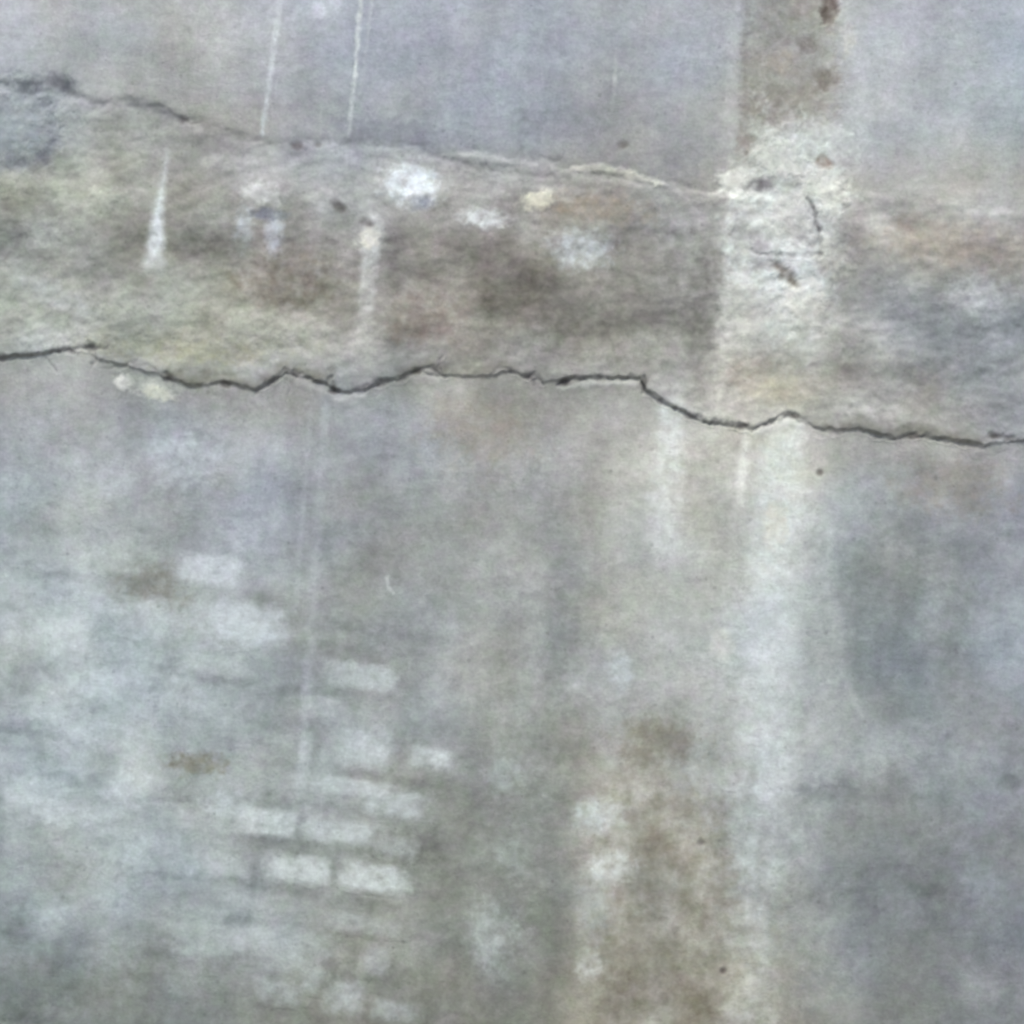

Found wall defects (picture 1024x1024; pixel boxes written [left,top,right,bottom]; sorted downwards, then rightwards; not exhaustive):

crack [14,65,204,128]
damp [137,147,173,280]
crack [231,128,306,151]
crack [338,127,574,186]
damp [352,212,388,350]
damp [491,210,724,373]
crack [0,339,1024,460]